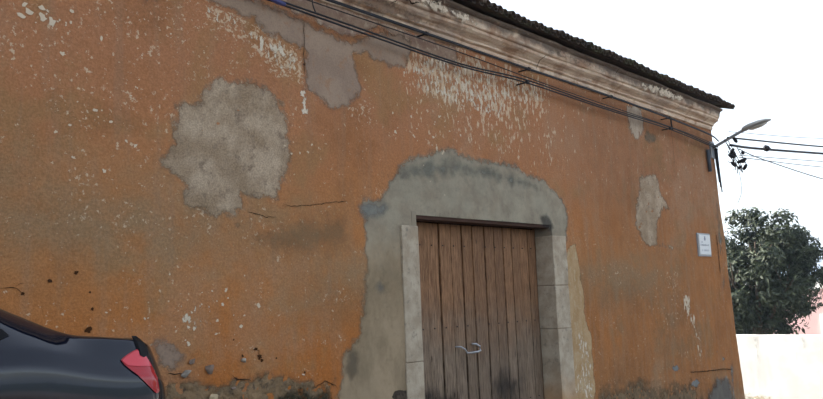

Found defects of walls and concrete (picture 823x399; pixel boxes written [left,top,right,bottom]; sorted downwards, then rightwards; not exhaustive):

peeling [17,2,74,27]
peeling [404,59,542,118]
peeling [175,288,229,331]
peeling [567,244,703,399]
flaking render [166,358,330,399]
spalling [392,390,407,399]